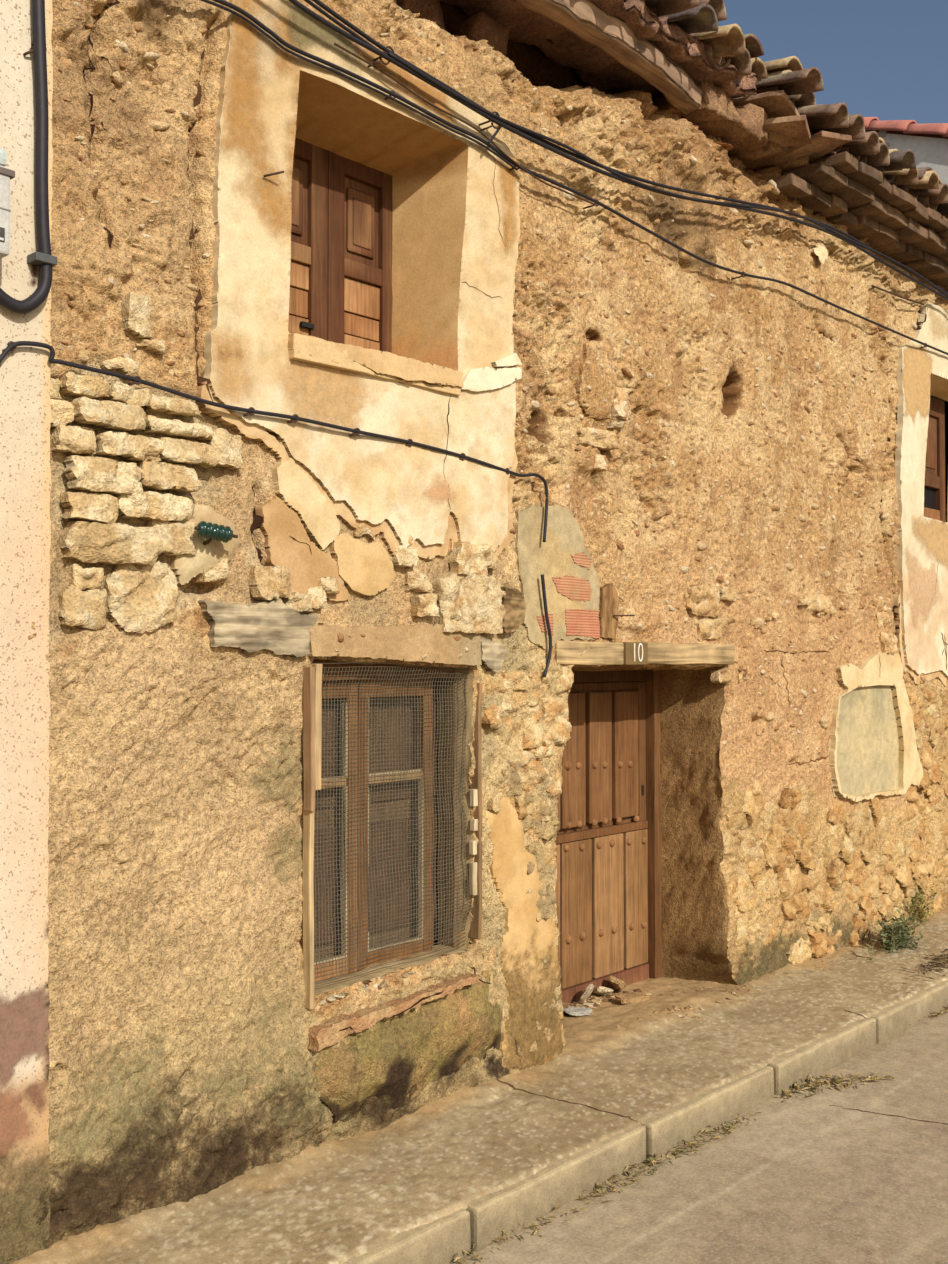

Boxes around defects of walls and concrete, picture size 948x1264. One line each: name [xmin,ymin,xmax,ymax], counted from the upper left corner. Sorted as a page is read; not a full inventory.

crack [83,0,120,163]
crack [186,27,210,172]
crack [98,208,113,248]
crack [188,223,196,249]
crack [191,282,213,401]
spalling [50,292,245,634]
flaking render [248,457,506,634]
spalling [481,657,574,1069]
damp [0,1088,305,1264]
damp [358,1084,417,1129]
crack [830,1105,946,1124]